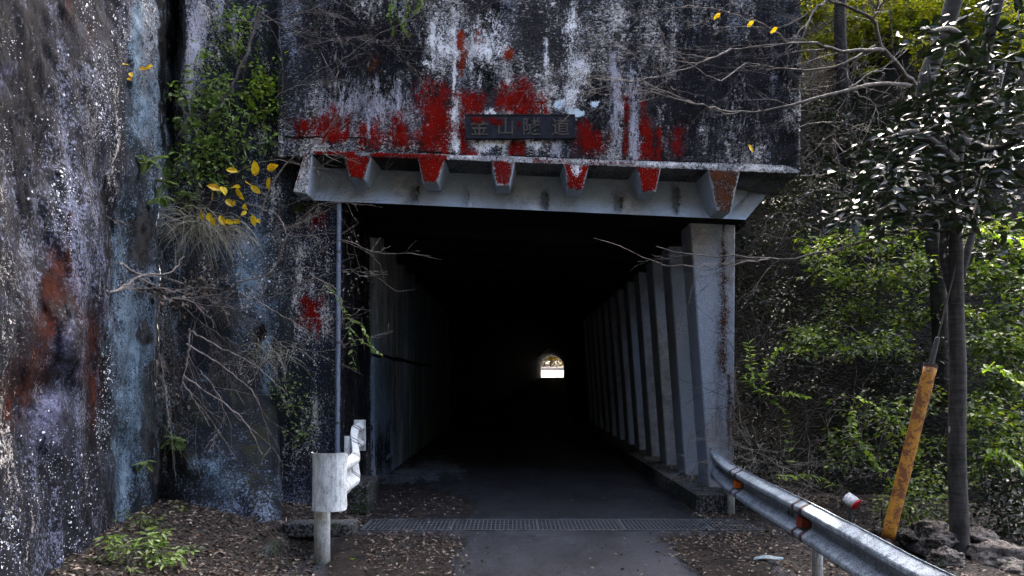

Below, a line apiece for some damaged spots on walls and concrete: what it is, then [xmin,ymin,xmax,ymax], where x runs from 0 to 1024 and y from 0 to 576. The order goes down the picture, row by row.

leakage [295,1,518,160]
leakage [524,0,717,176]
corrosion [0,211,110,443]
corrosion [710,169,740,459]